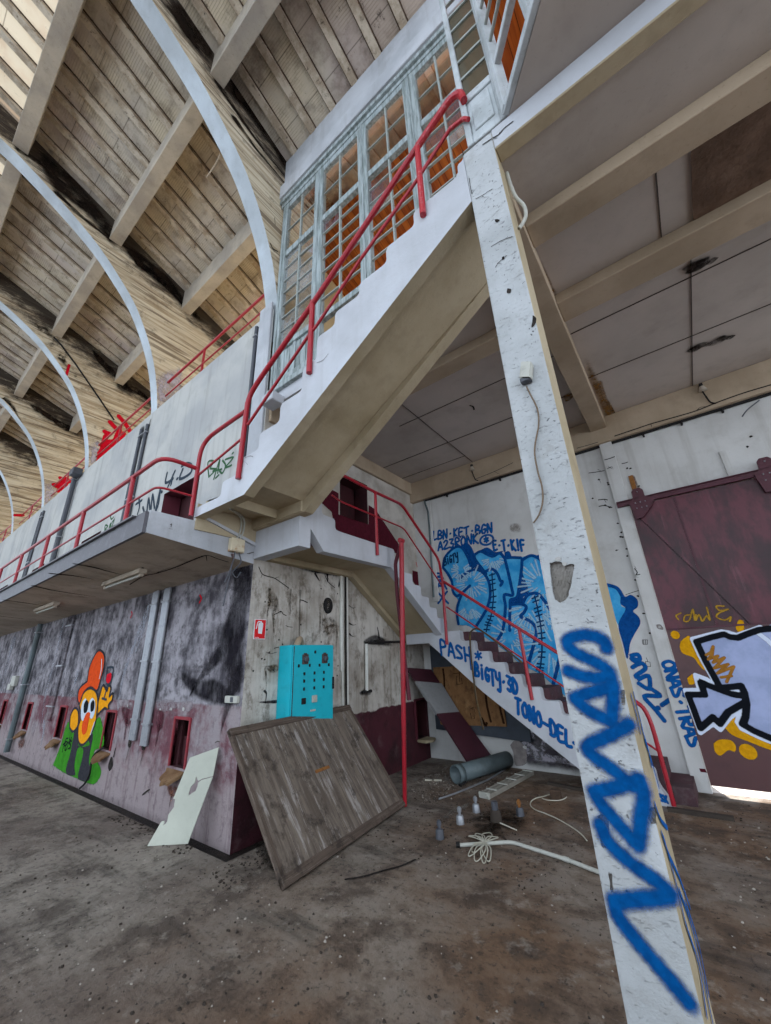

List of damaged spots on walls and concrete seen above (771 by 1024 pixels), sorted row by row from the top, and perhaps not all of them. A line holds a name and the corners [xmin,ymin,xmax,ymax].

water stain [15,146,112,242]
spalling [550,556,574,603]
water stain [190,649,222,695]
water stain [222,682,236,726]